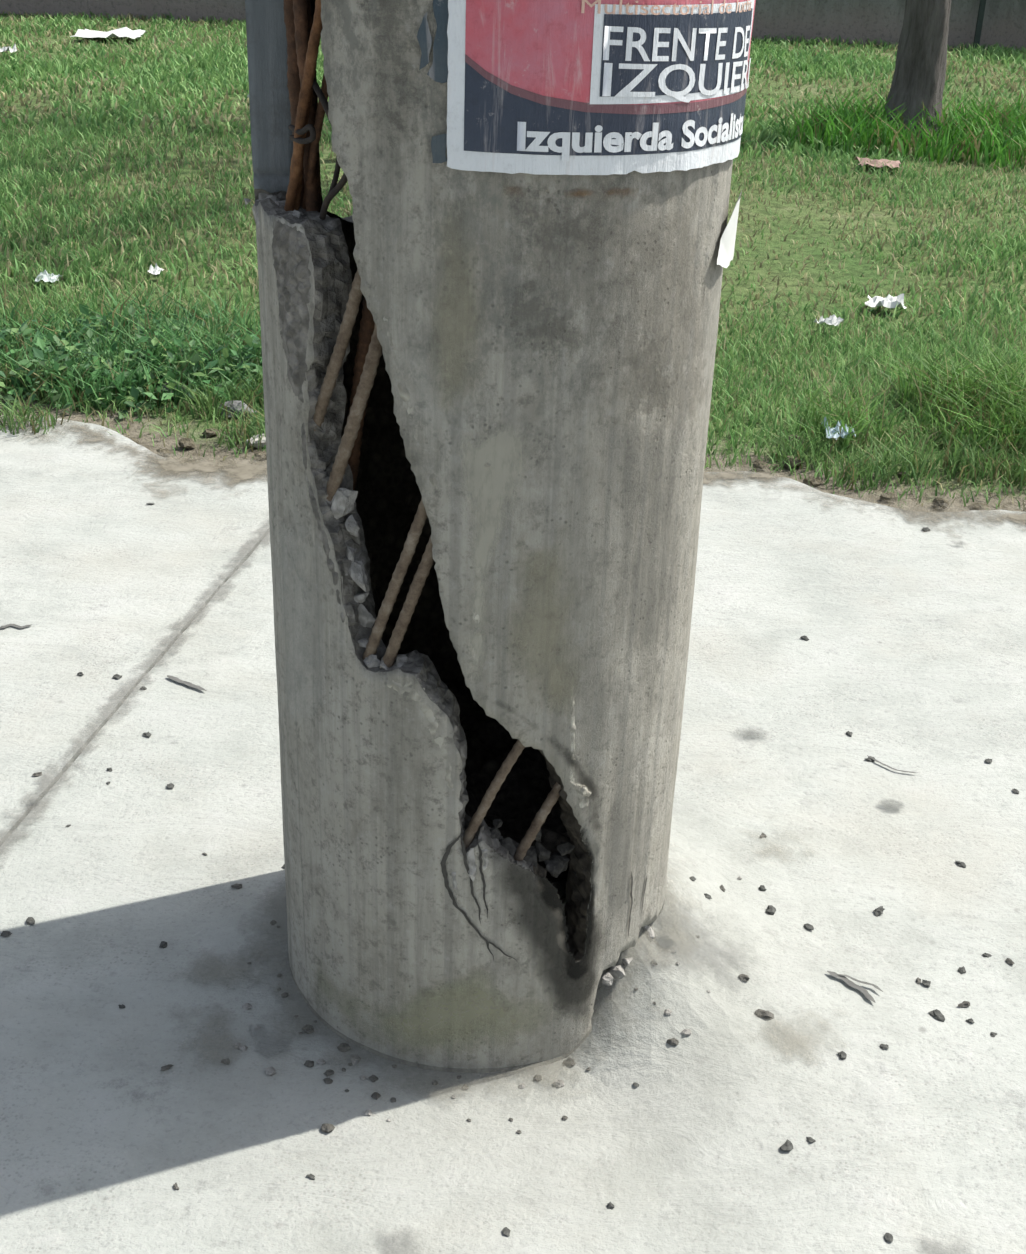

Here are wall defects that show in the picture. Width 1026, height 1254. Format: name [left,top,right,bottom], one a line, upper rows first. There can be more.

spalling [244,193,314,403]
spalling [301,423,453,789]
spalling [569,680,591,808]
crack [440,836,517,961]
spalling [452,819,577,890]